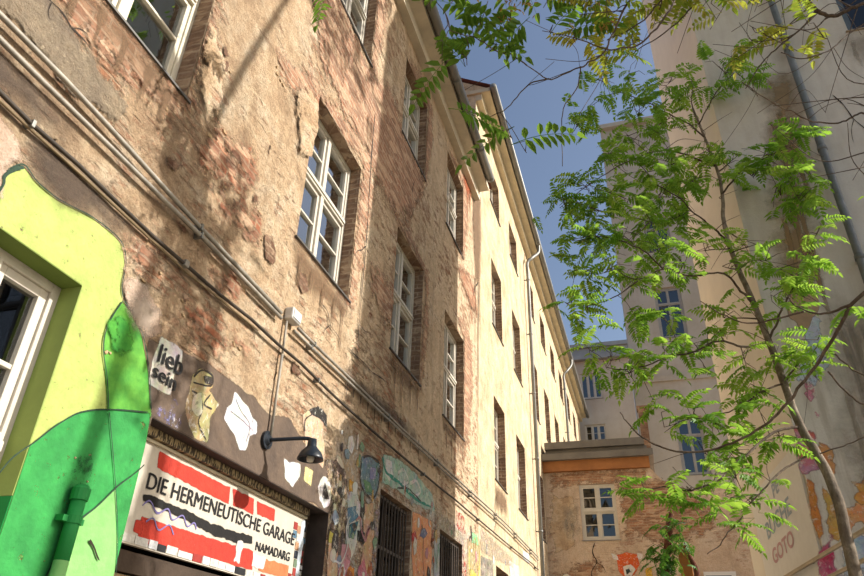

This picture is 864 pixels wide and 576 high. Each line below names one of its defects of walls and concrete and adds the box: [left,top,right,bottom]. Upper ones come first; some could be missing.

flaking render [0,0,227,124]
peeling [0,117,21,199]
flaking render [195,118,276,266]
peeling [104,233,166,356]